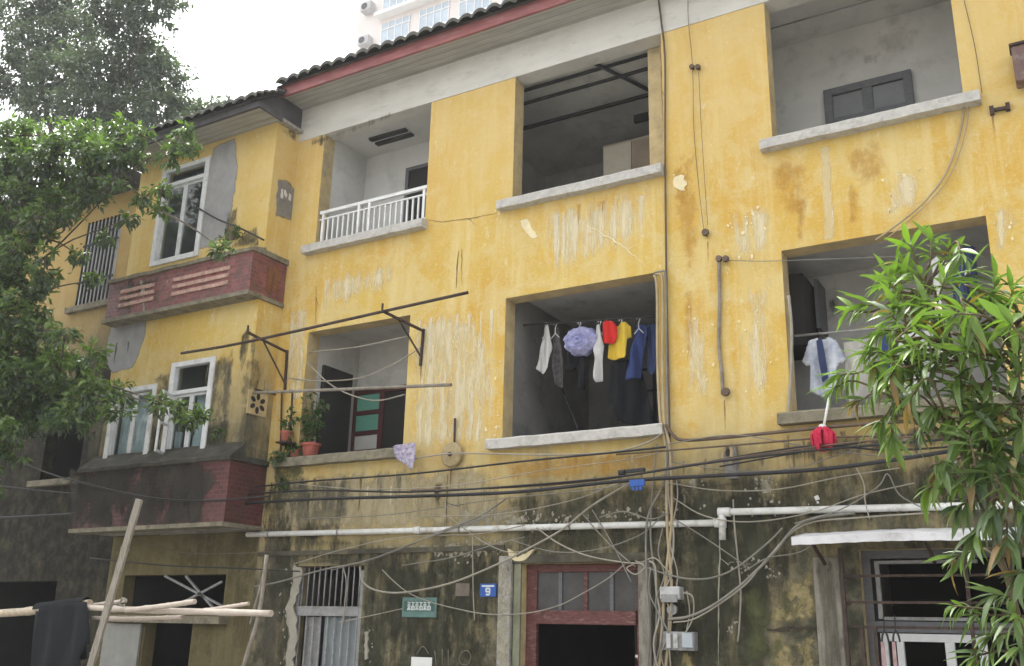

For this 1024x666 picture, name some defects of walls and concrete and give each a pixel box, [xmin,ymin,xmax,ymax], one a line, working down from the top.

flaking render [276,180,294,220]
peeling [520,219,538,239]
leakage [553,195,643,265]
leakage [206,358,265,446]
leakage [513,493,540,542]
leakage [550,434,968,666]